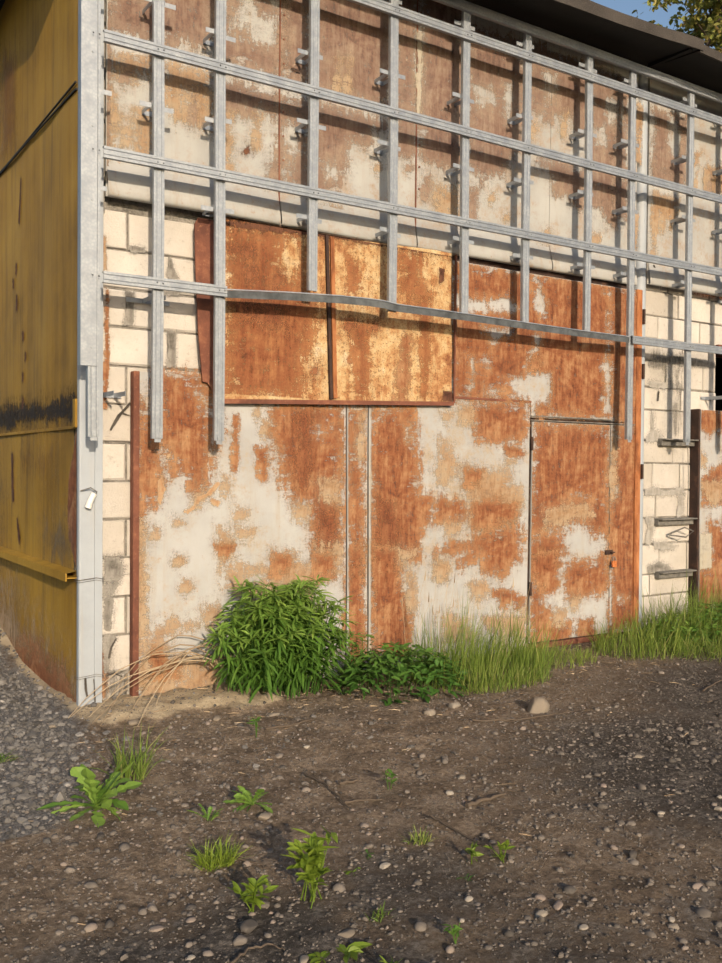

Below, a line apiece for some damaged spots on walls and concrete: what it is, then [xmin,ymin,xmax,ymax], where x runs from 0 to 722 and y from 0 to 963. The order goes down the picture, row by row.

rust [107,0,152,41]
rust [107,44,152,154]
rust [164,0,722,255]
peeling [184,482,221,514]
rust [139,216,637,696]
rust [699,451,722,608]
rust [701,410,722,440]